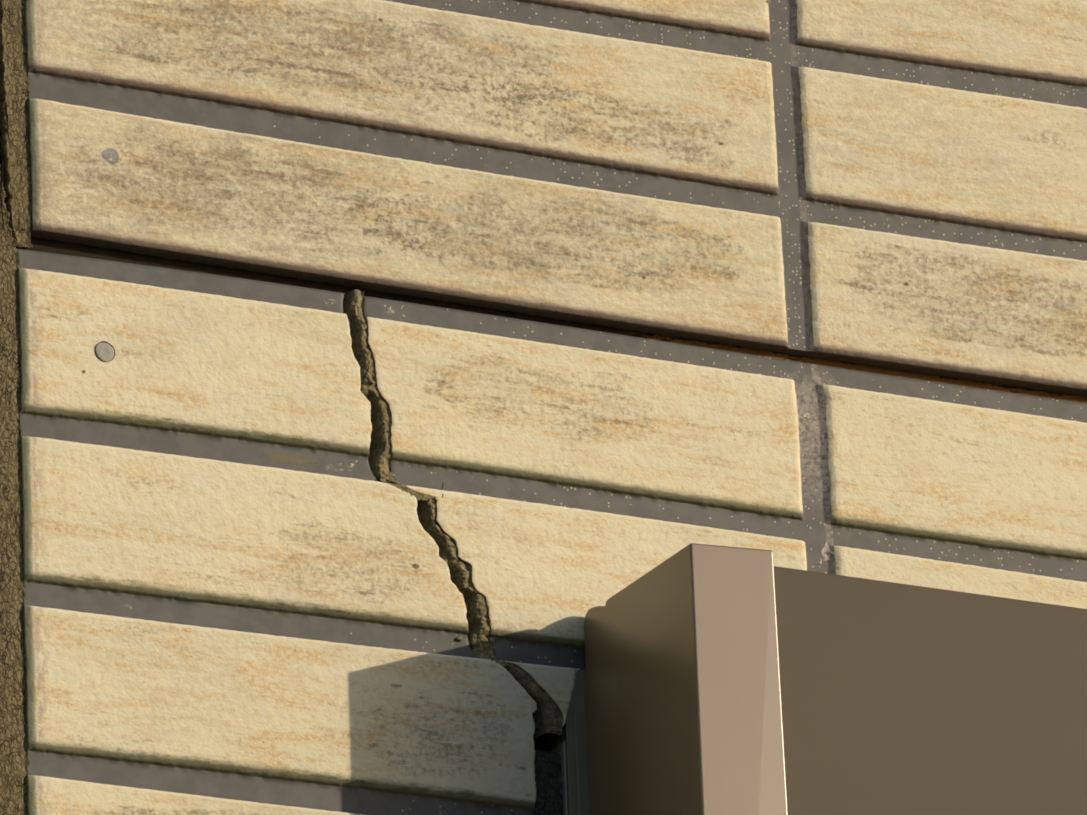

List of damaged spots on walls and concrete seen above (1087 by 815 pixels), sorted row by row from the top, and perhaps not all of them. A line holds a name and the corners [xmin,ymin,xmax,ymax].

crack [0,0,19,247]
crack [343,289,563,751]